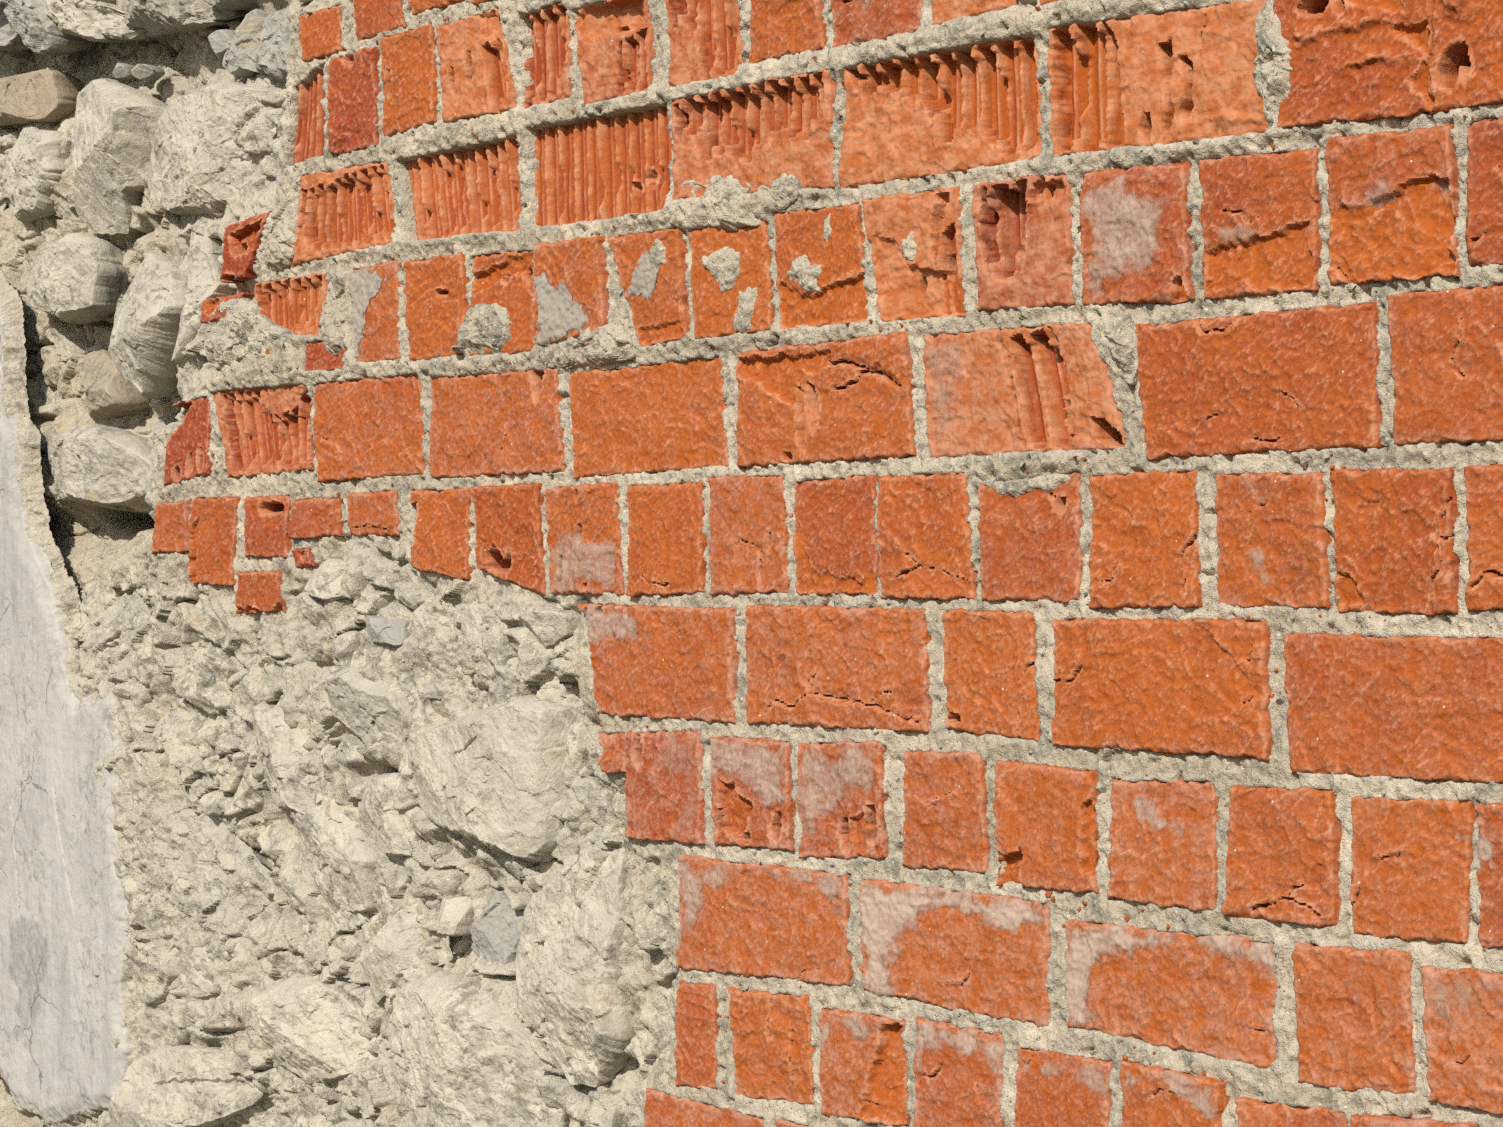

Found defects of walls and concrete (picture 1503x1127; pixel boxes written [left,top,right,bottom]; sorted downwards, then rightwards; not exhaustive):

spalling [200,64,395,336]
spalling [344,0,1471,616]
spalling [163,384,315,487]
spalling [188,496,320,614]
spalling [578,603,889,860]
spalling [993,760,1100,894]
spalling [818,1008,911,1126]
spalling [1014,1045,1113,1127]